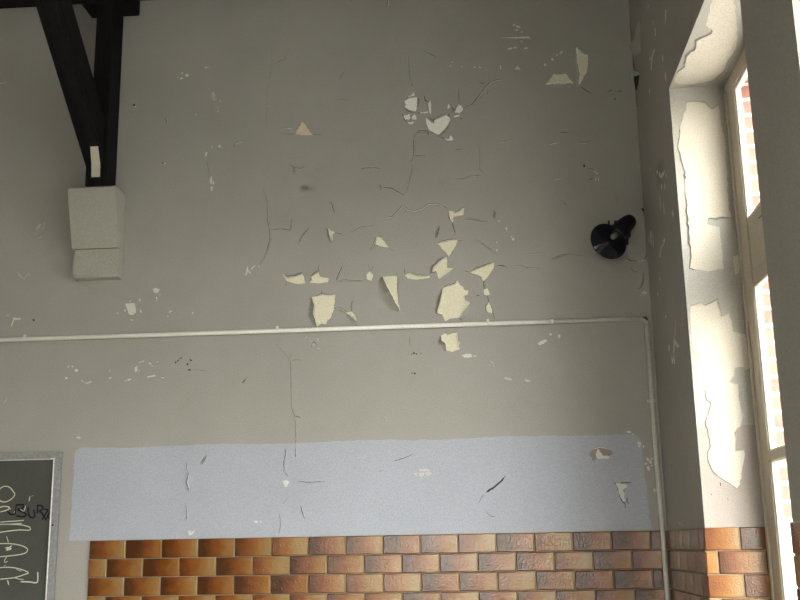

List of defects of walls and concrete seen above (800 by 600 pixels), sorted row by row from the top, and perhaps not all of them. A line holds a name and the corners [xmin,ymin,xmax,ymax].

peeling [402,81,463,141]
peeling [546,48,592,94]
peeling [665,0,738,85]
crack [360,134,448,238]
peeling [677,100,733,271]
peeling [283,208,495,327]
crack [277,343,325,534]
peeling [438,332,475,358]
peeling [690,298,750,488]